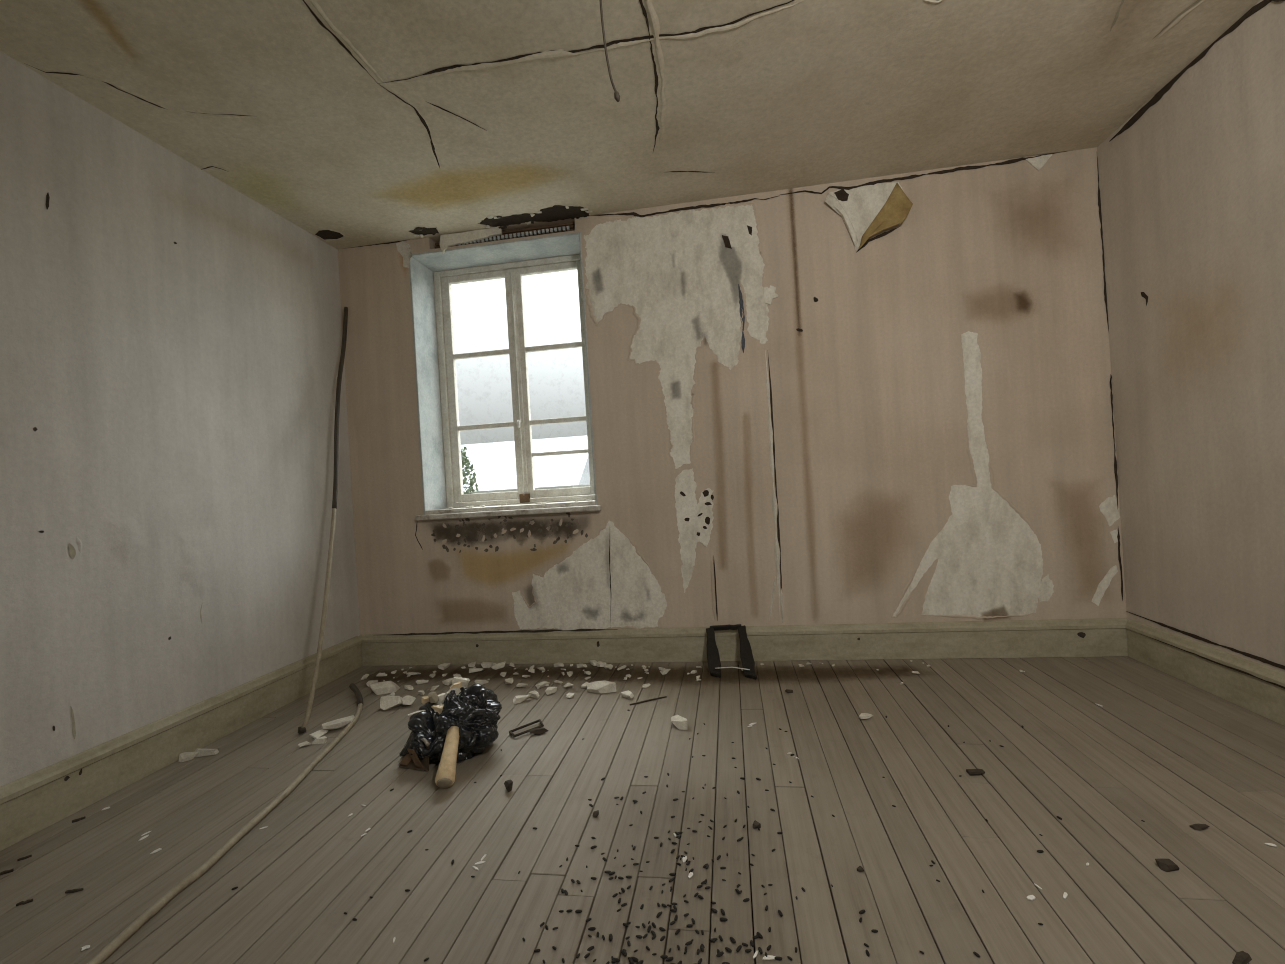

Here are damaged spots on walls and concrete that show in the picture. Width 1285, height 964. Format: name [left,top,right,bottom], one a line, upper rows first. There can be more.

crack [24,63,253,118]
crack [303,0,1272,330]
spalling [834,189,849,201]
flaking render [396,202,778,593]
water stain [431,512,588,553]
flaking render [512,519,667,647]
flaking render [891,331,1054,620]